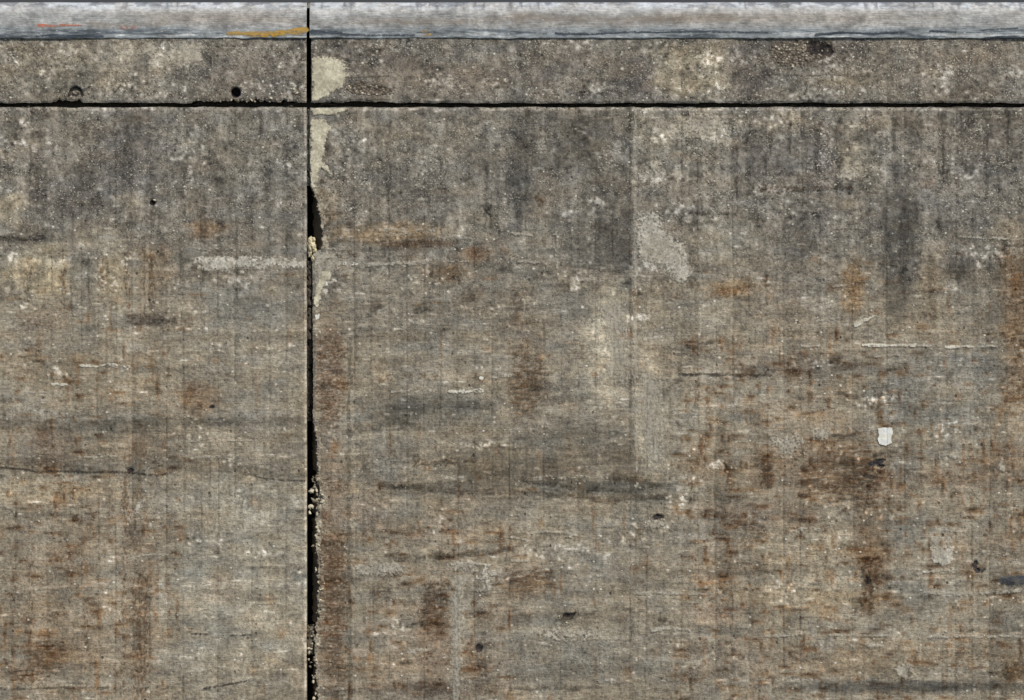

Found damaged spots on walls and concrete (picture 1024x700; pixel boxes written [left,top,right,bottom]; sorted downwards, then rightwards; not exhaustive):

spalling [311,188,329,251]